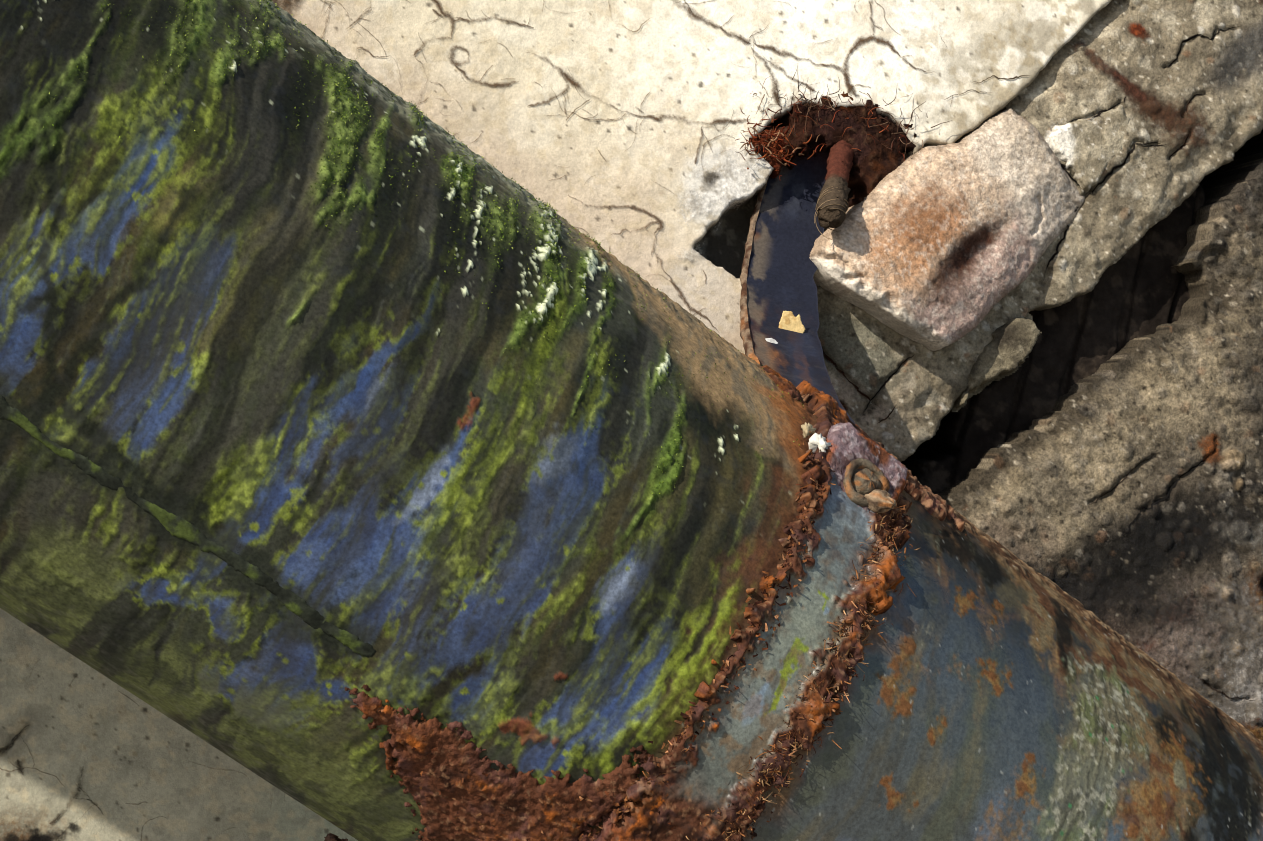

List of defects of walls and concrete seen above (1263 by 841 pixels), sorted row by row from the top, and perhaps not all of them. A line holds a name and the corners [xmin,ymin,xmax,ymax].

crack [321,0,929,164]
crack [944,75,1030,109]
corrosion [1073,41,1209,156]
peeling [1045,105,1130,194]
crack [572,197,717,330]
corrosion [930,226,995,304]
crack [823,351,915,423]
peeling [952,313,1042,412]
corrosion [345,431,842,841]
corrosion [700,443,967,841]
crack [0,725,29,774]
crack [49,769,95,824]